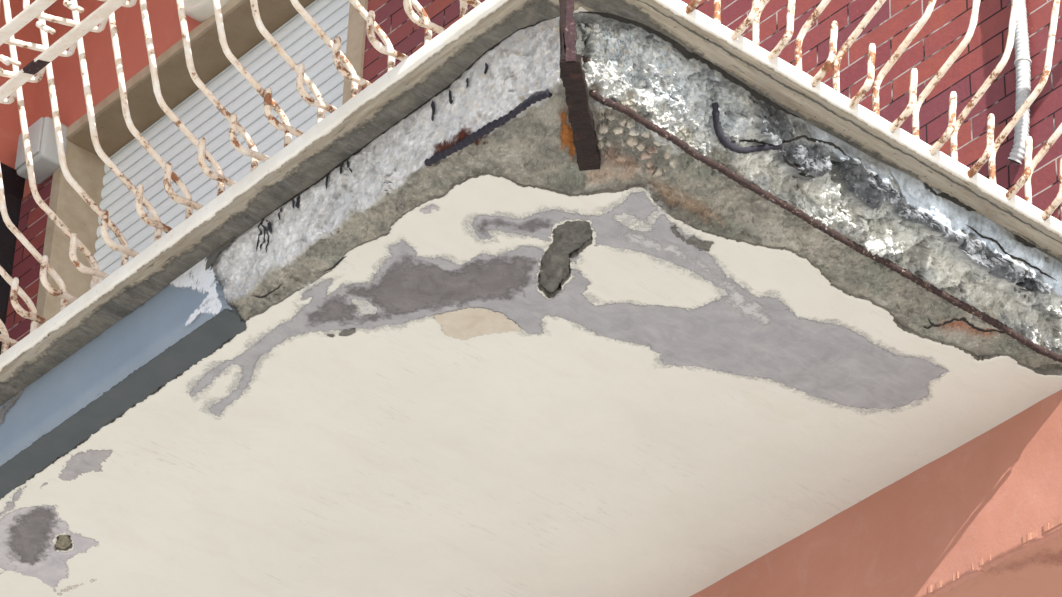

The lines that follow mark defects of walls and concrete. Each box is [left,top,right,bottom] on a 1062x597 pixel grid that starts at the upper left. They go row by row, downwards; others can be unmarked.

crack [579,12,854,179]
crack [261,18,553,234]
rust [434,129,486,155]
rust [560,112,575,160]
spalling [170,13,1062,416]
crack [205,236,234,270]
spalling [55,535,72,549]